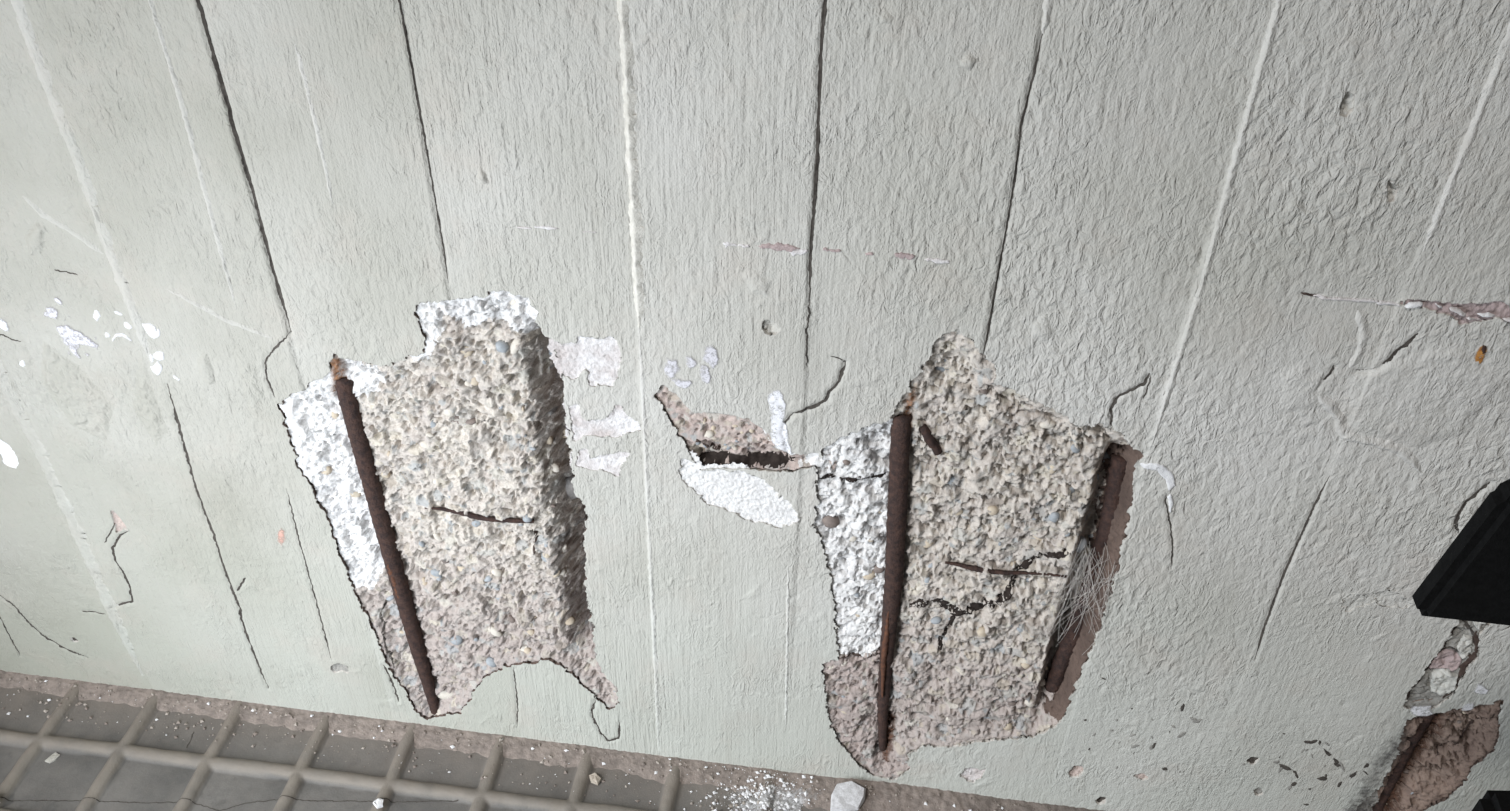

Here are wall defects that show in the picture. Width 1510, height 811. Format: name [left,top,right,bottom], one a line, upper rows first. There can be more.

crack [196,0,292,397]
crack [398,0,448,279]
crack [783,0,846,443]
crack [981,34,1043,363]
crack [167,384,269,688]
crack [286,489,332,660]
rust [330,358,345,392]
spalling [279,290,641,717]
rust [882,711,896,762]
spalling [654,330,1176,779]
spalling [1069,698,1203,776]
spalling [1230,620,1503,811]